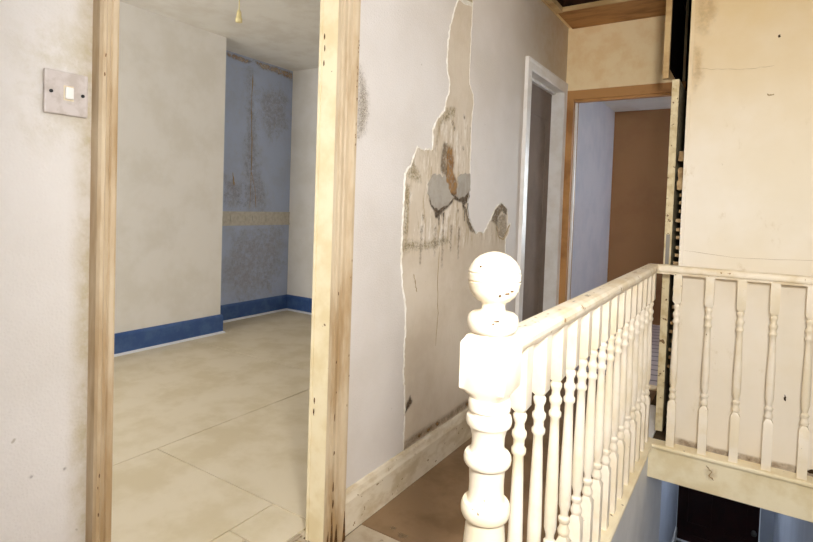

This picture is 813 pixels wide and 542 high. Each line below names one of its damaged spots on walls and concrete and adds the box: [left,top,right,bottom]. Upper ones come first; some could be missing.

flaking render [402,0,510,450]